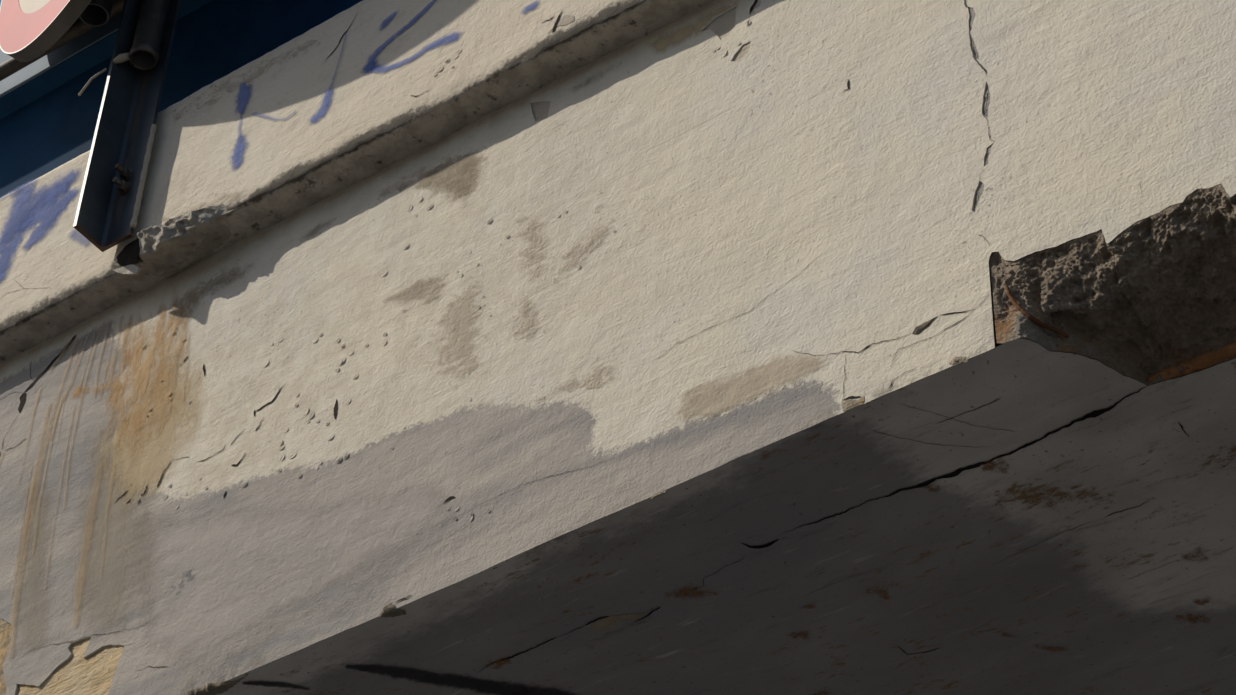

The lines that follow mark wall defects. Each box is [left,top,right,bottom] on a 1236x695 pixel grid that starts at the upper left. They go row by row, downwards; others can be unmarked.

crack [936,0,993,244]
spalling [990,184,1236,385]
corrosion [72,308,193,496]
crack [698,297,1145,588]
peeling [0,618,124,695]
crack [482,606,661,670]